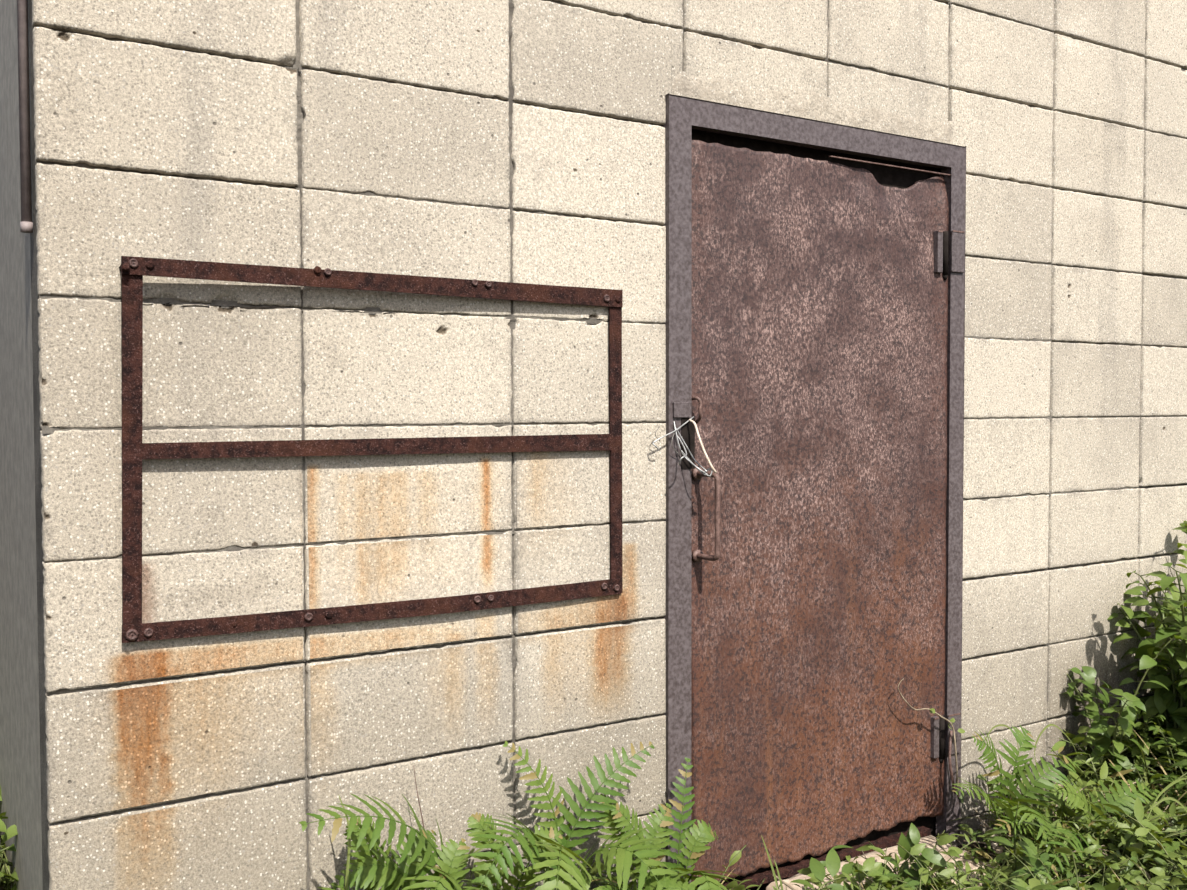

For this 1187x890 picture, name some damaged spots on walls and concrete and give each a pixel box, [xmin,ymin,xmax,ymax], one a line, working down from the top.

crack [143,302,290,312]
rust [257,451,589,613]
rust [68,539,654,890]